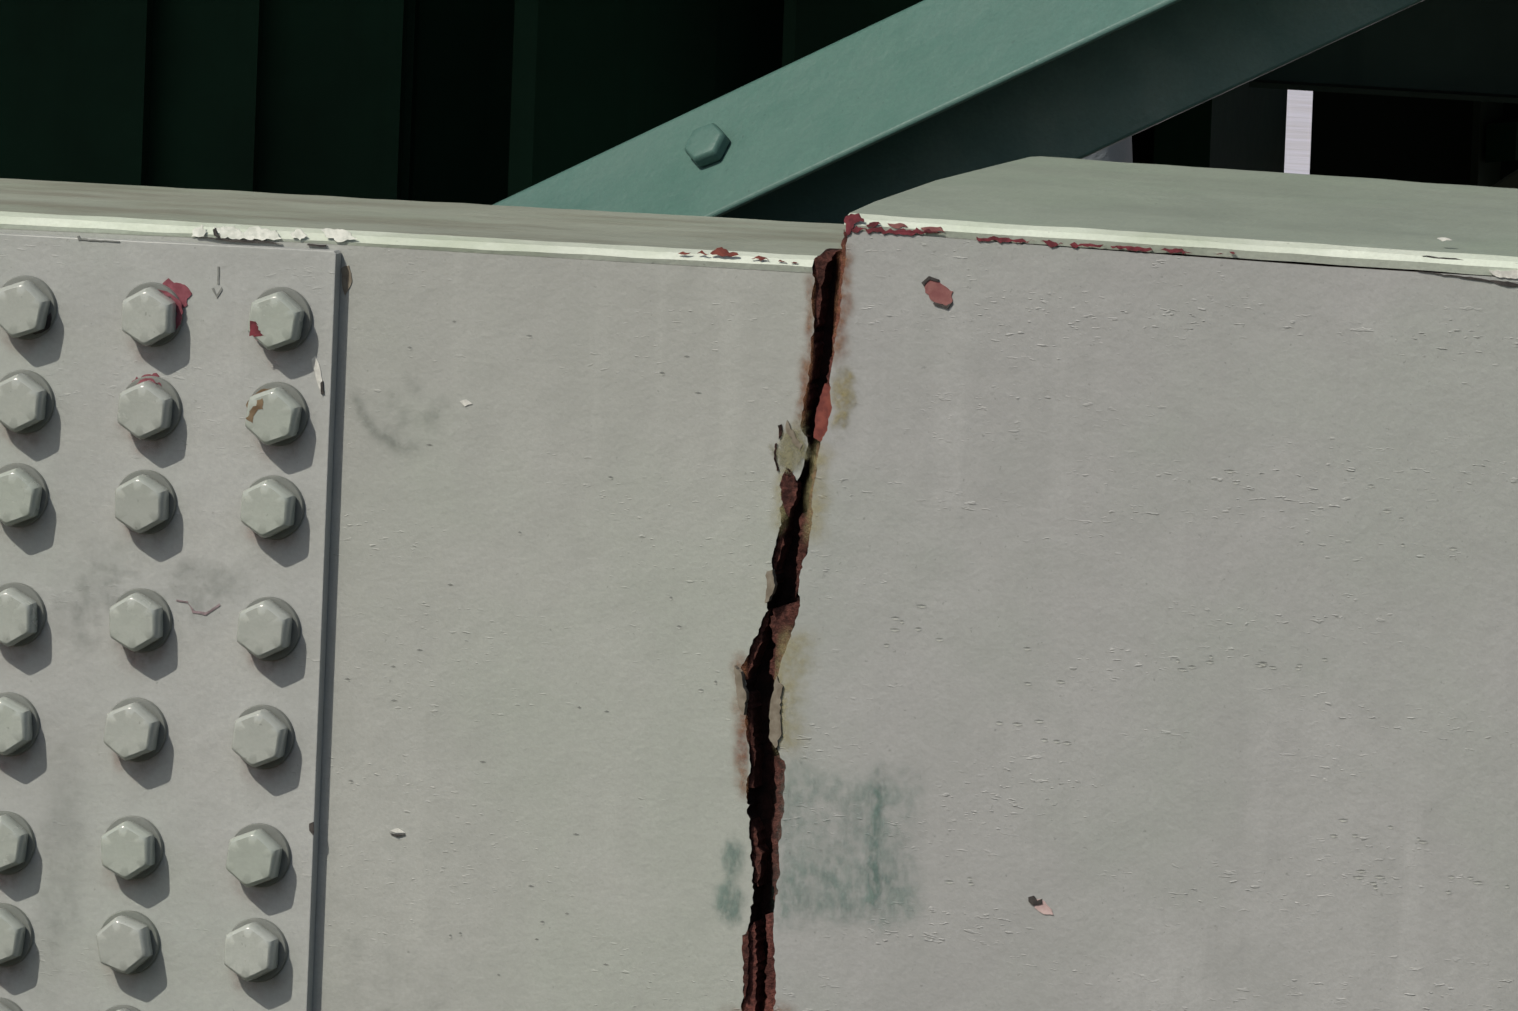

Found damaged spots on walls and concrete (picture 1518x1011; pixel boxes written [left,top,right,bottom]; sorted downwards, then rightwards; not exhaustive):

peeling [844,213,944,237]
peeling [678,247,797,263]
peeling [976,236,1190,254]
peeling [922,276,953,309]
peeling [157,278,192,333]
peeling [132,373,162,386]
crack [734,230,847,1011]